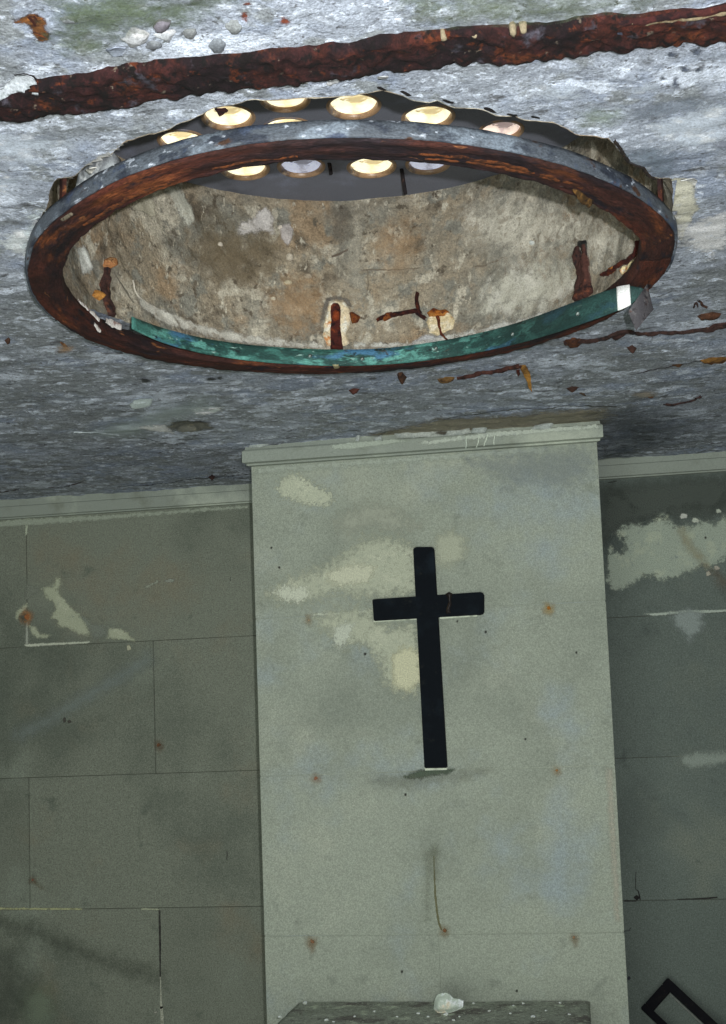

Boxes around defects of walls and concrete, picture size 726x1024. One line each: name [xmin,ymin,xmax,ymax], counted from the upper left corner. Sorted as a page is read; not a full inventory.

corrosion [14,14,50,42]
peeling [133,197,156,217]
peeling [165,186,194,225]
peeling [239,208,293,245]
peeling [78,248,93,273]
peeling [462,190,639,324]
peeling [78,299,122,332]
spalling [322,296,360,346]
spalling [376,292,455,345]
corrosion [697,312,721,320]
damp [600,479,726,544]
damp [24,623,90,647]